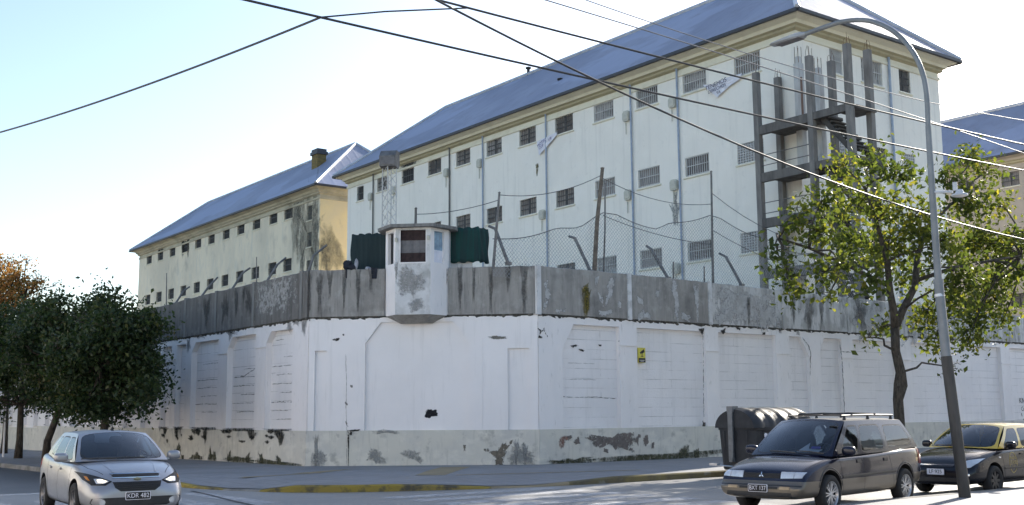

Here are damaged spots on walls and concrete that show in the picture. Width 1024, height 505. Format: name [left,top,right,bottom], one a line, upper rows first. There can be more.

water stain [290,205,372,310]
flaking render [484,440,513,465]
flaking render [564,432,654,453]